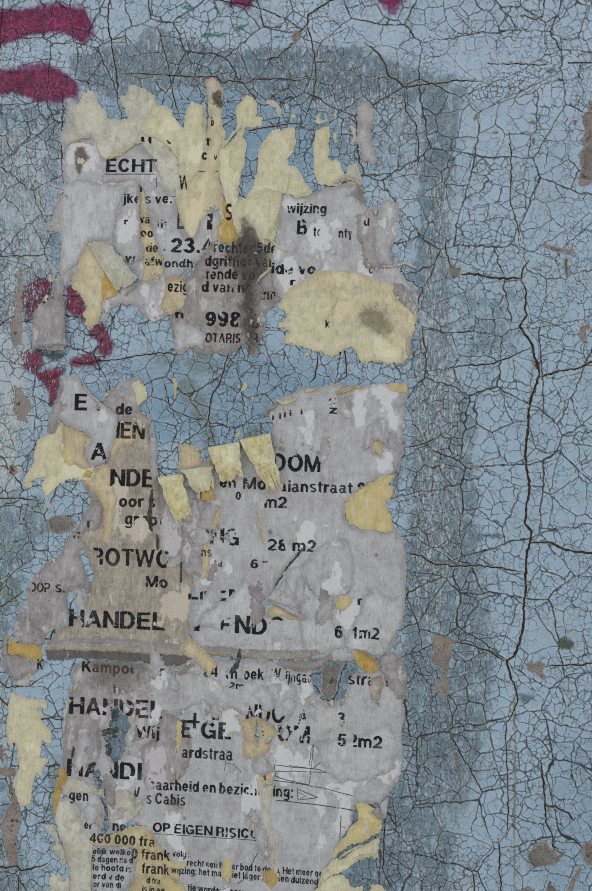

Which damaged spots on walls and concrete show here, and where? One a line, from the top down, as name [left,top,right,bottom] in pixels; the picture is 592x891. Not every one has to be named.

crack [107,0,334,131]
crack [364,42,547,168]
spalling [573,102,592,186]
crack [509,133,520,240]
crack [75,352,180,365]
crack [164,354,229,446]
crack [409,237,592,891]
crack [0,674,50,688]
peeling [431,635,456,701]
crack [0,863,48,891]
spalling [525,842,565,870]
spalling [546,842,592,891]